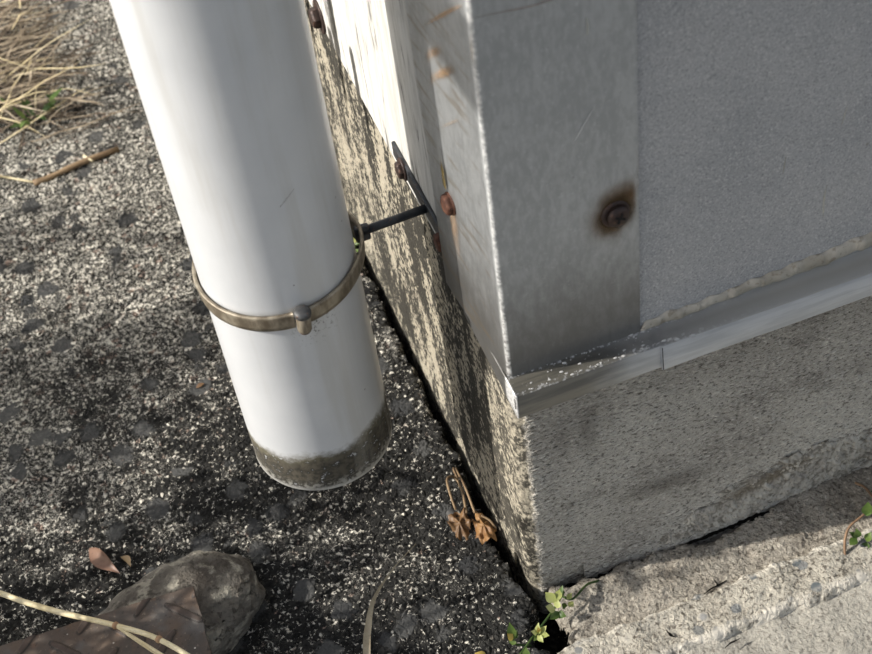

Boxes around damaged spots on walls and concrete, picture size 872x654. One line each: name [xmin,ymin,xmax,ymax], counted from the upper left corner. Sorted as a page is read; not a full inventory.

corrosion [597,189,633,231]
spalling [659,428,872,545]
crack [685,510,770,545]